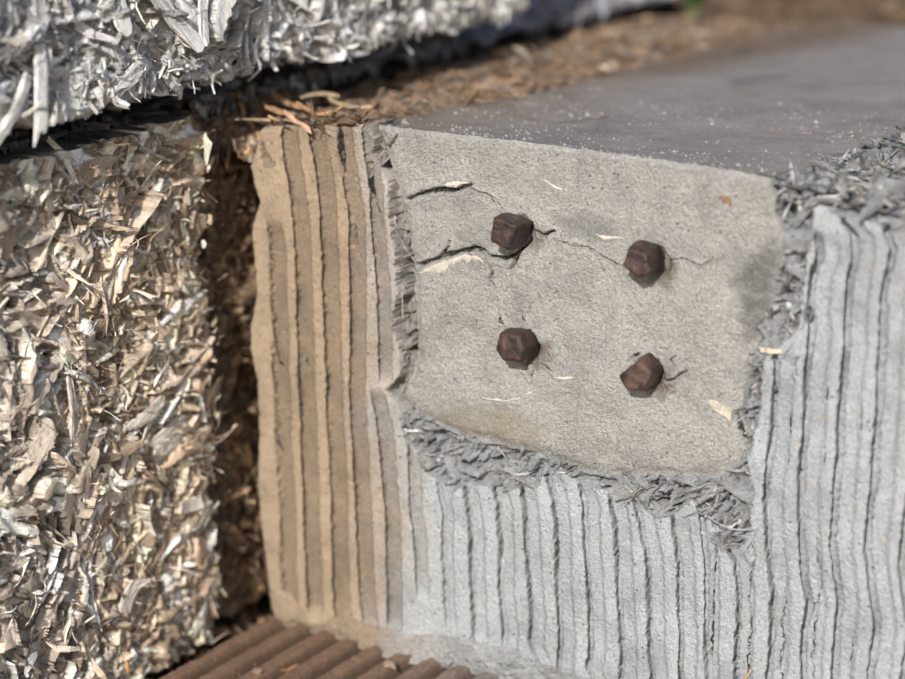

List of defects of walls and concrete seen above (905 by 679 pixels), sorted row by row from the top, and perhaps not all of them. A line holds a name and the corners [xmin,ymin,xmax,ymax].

crack [412,185,501,206]
crack [423,230,623,285]
spalling [369,118,850,553]